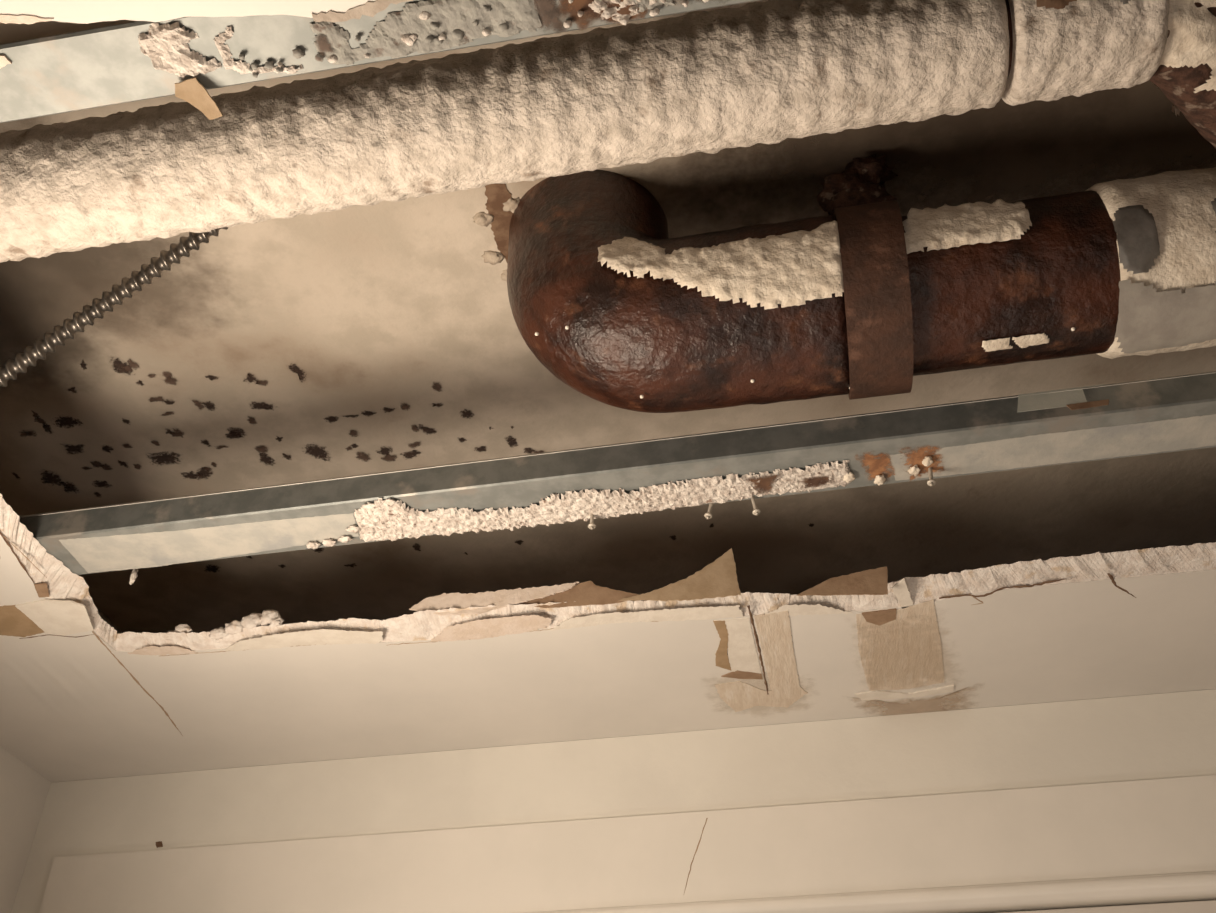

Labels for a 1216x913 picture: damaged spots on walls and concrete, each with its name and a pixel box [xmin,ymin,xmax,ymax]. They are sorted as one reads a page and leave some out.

rust [534,0,709,32]
spalling [239,35,338,78]
spalling [472,183,520,282]
water stain [113,358,177,386]
water stain [65,397,273,497]
water stain [325,404,437,462]
rust [747,475,777,494]
rust [802,446,944,488]
crack [0,532,47,583]
peeling [306,525,361,549]
peeling [0,583,94,637]
crack [19,632,183,736]